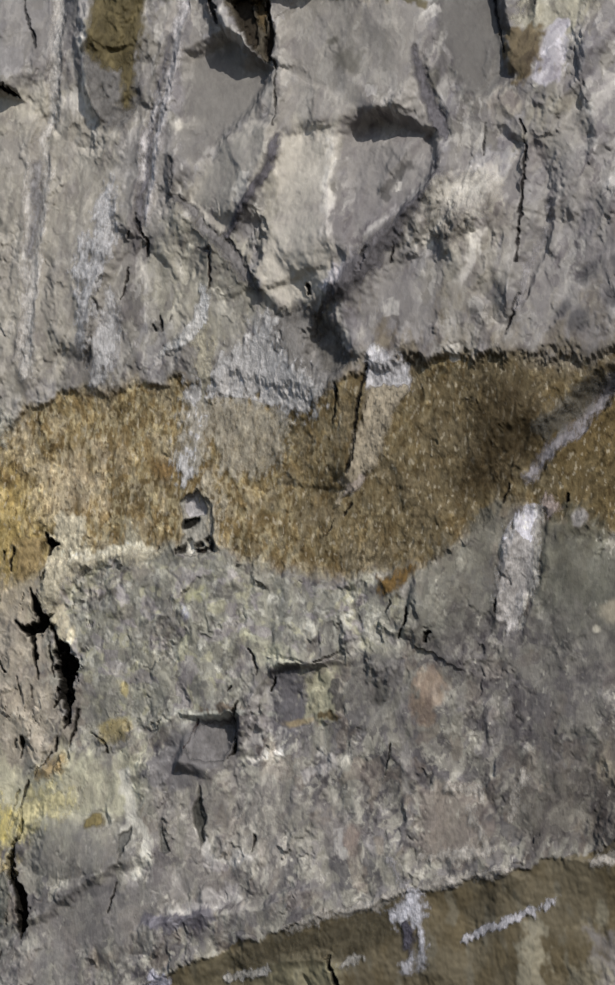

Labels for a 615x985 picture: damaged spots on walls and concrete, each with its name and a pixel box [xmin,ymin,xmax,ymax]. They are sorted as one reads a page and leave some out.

spalling [225,0,275,62]
crack [494,0,505,53]
crack [0,82,20,98]
crack [514,119,528,262]
crack [506,293,520,330]
damp [366,344,412,388]
damp [159,284,329,553]
damp [467,376,606,490]
damp [40,546,161,621]
damp [503,493,558,628]
crack [0,533,108,956]
crack [324,956,339,985]